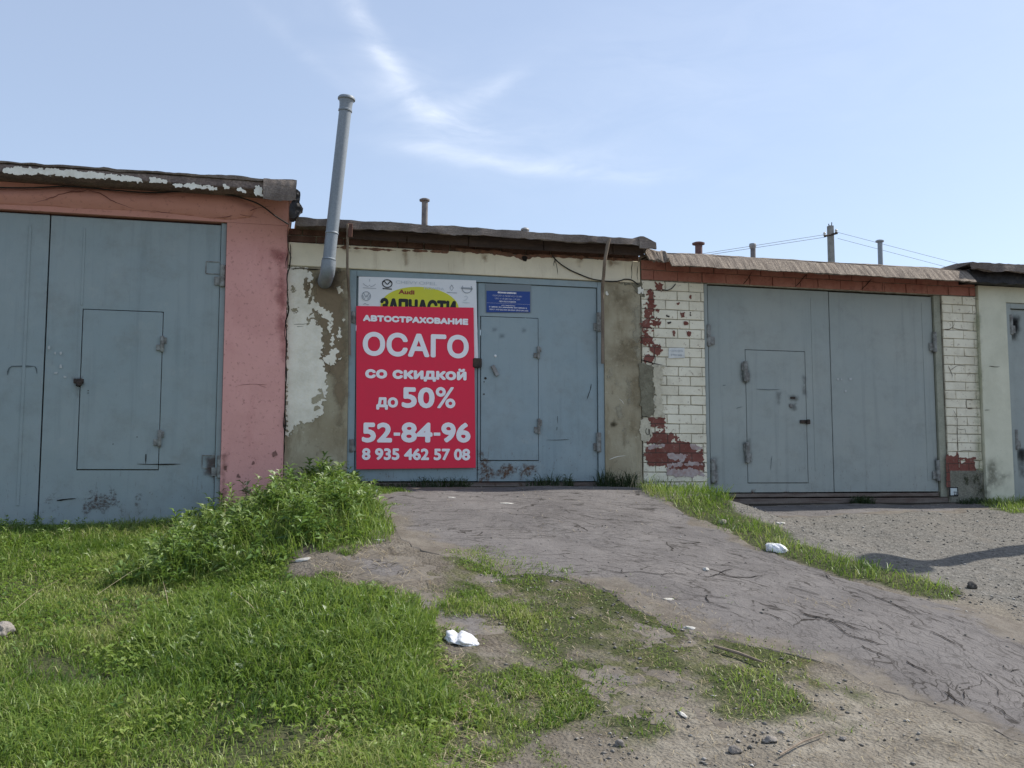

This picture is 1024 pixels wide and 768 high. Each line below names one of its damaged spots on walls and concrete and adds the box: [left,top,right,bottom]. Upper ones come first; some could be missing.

peeling [3,166,263,197]
peeling [284,266,345,437]
peeling [619,280,692,363]
corrosion [478,453,536,482]
peeling [639,417,705,478]
peeling [946,452,976,487]